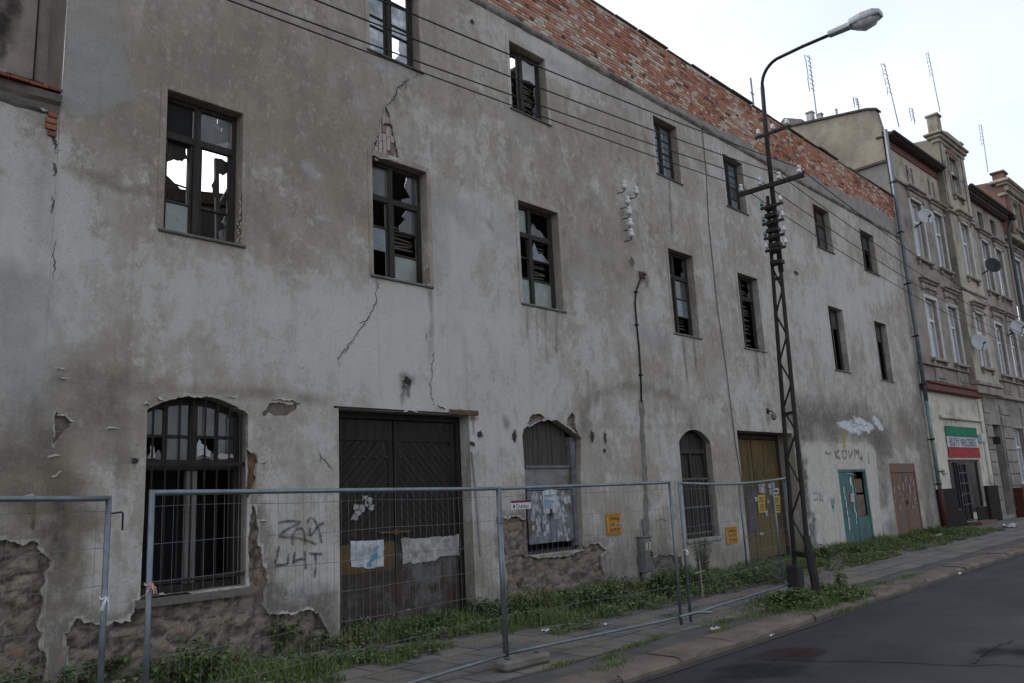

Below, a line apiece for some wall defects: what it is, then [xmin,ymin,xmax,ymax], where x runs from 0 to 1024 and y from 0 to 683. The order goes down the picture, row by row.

flaking render [0,493,332,683]